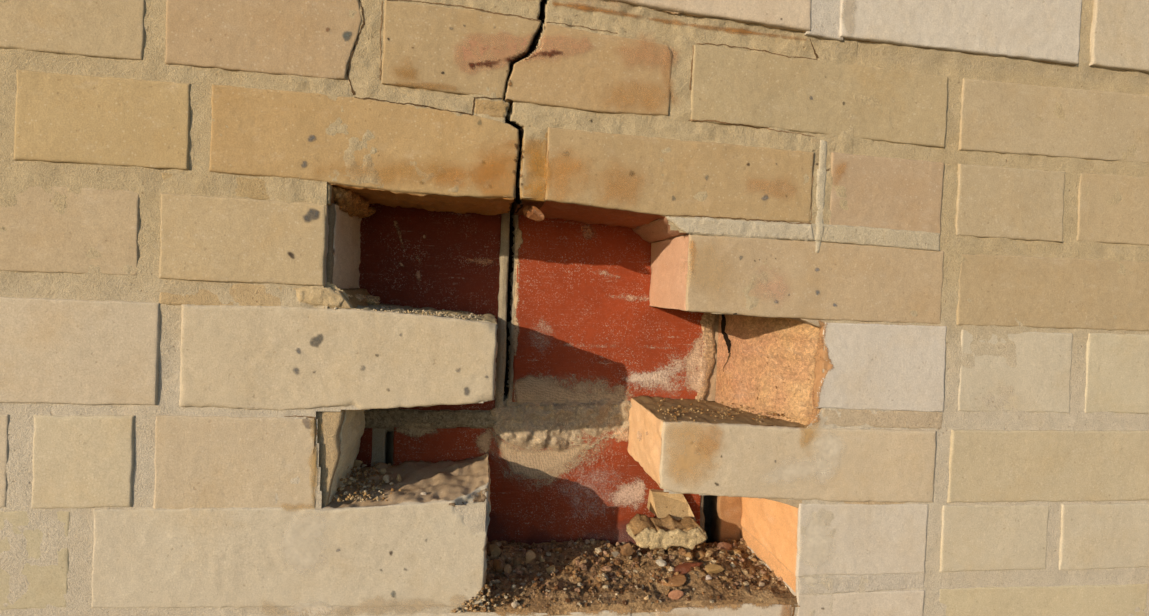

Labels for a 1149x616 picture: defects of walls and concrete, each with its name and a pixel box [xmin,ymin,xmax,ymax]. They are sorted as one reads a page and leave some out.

crack [689,39,819,90]
crack [347,0,617,401]
spalling [715,314,822,425]
spalling [449,488,489,507]